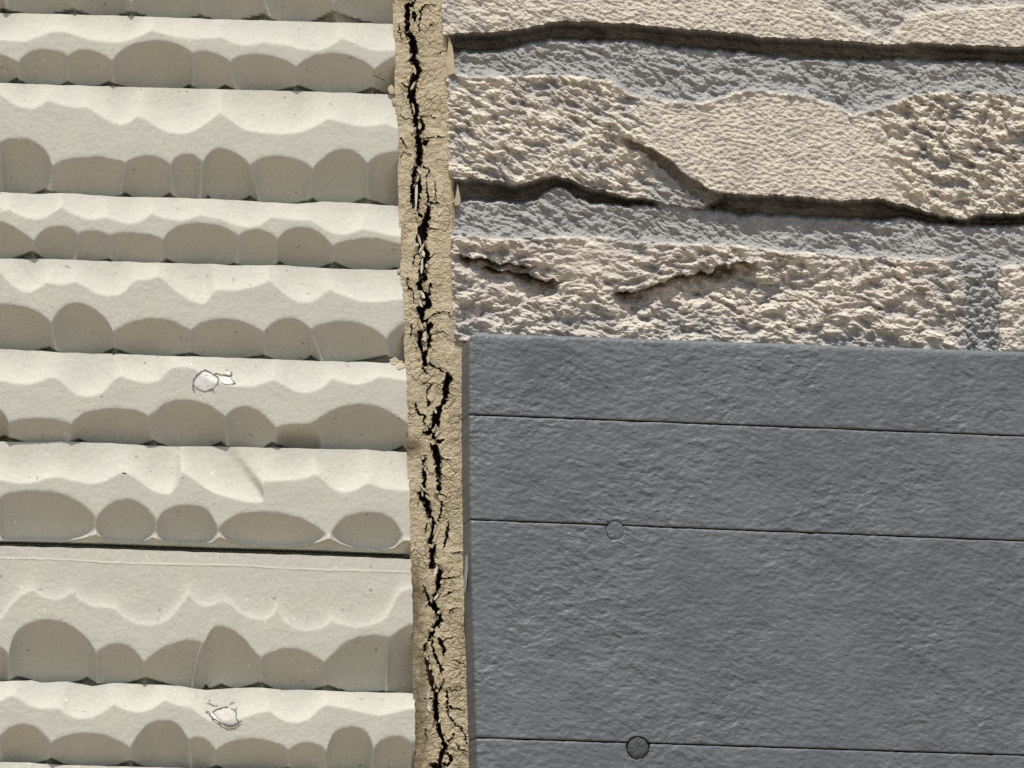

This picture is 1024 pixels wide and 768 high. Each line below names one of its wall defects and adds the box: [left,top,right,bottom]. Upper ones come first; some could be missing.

peeling [192,369,236,391]
crack [372,0,467,768]
peeling [206,702,241,727]